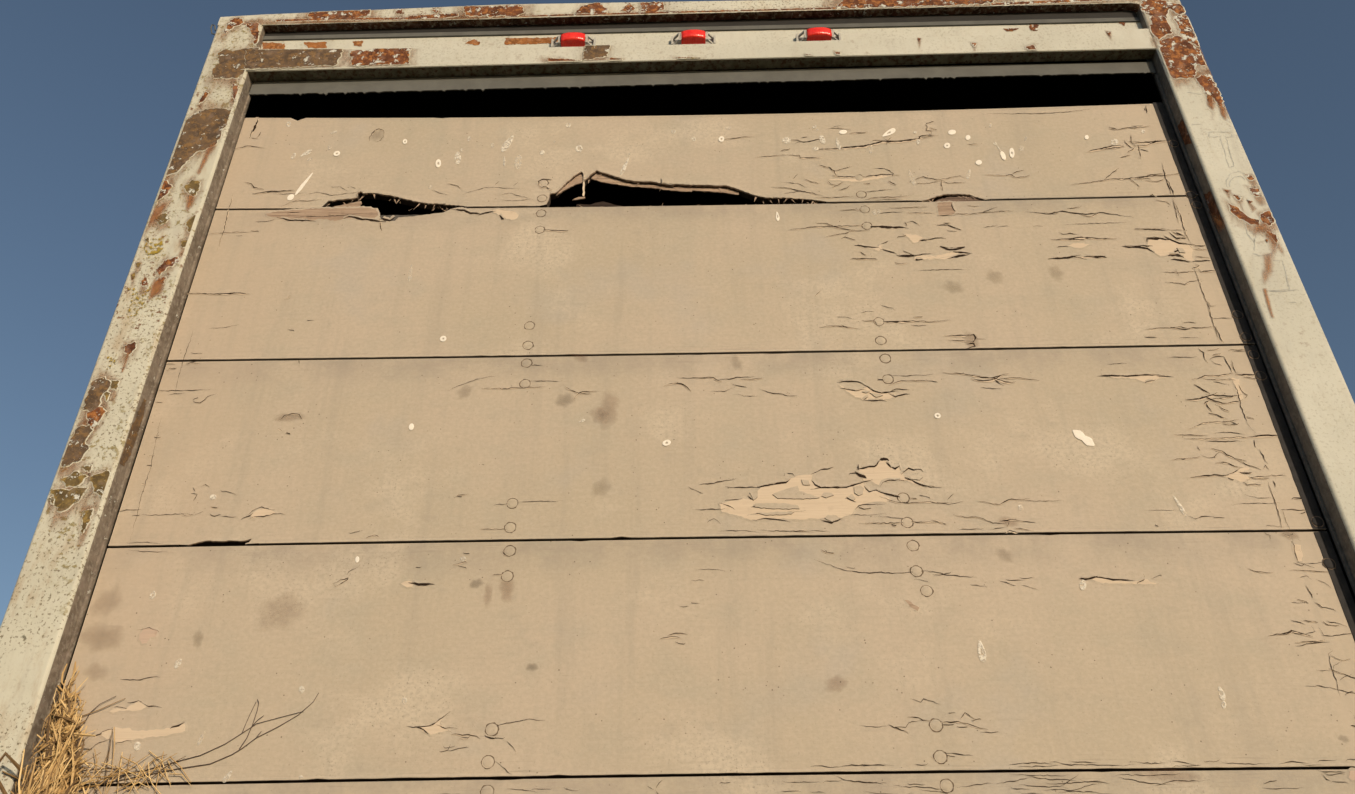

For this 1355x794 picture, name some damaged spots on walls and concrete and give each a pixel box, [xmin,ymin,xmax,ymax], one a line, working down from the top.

corrosion [131,0,1226,298]
crack [436,176,568,232]
peeling [935,201,958,217]
peeling [854,233,973,261]
peeling [1124,228,1195,262]
corrosion [1204,174,1279,317]
corrosion [48,341,146,535]
crack [664,377,789,396]
crack [725,106,1354,726]
peeling [693,456,935,523]
peeling [90,699,188,750]
crack [783,698,1355,794]